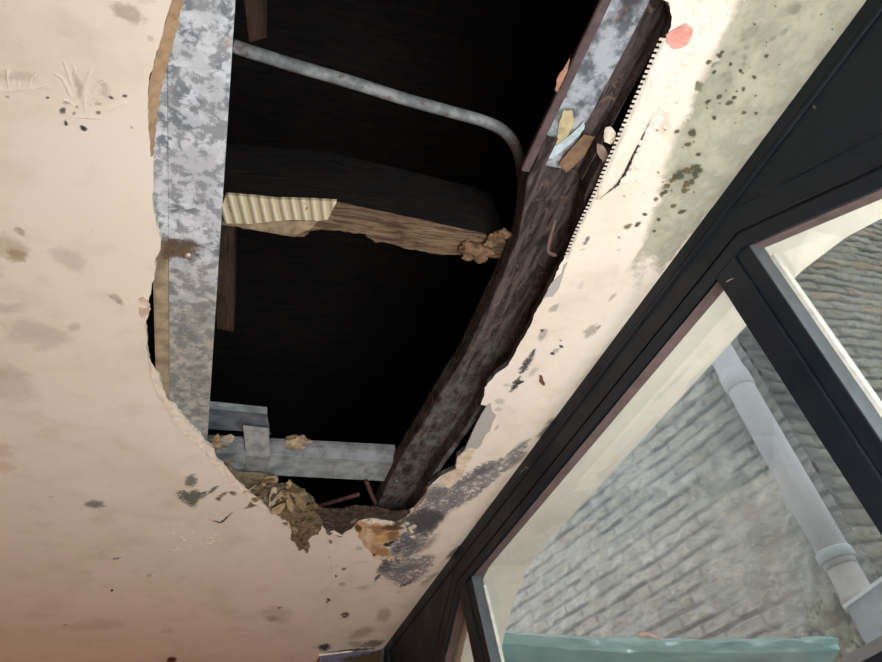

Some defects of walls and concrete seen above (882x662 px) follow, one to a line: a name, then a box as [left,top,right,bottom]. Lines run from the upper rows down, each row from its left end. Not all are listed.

spalling [148,0,185,157]
water stain [618,0,865,266]
water stain [178,475,235,507]
spalling [208,434,417,561]
water stain [374,440,529,587]
peeling [439,449,475,488]